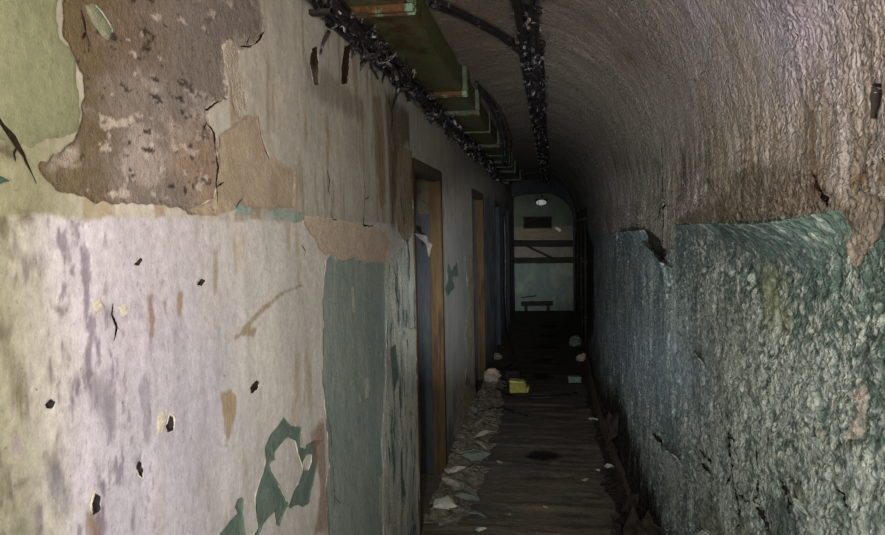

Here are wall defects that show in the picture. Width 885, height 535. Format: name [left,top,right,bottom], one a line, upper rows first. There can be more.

flaking render [0,0,295,216]
crack [0,119,37,184]
peeling [747,192,885,278]
peeling [218,142,432,535]
flaking render [156,411,175,434]
spalling [90,491,101,515]